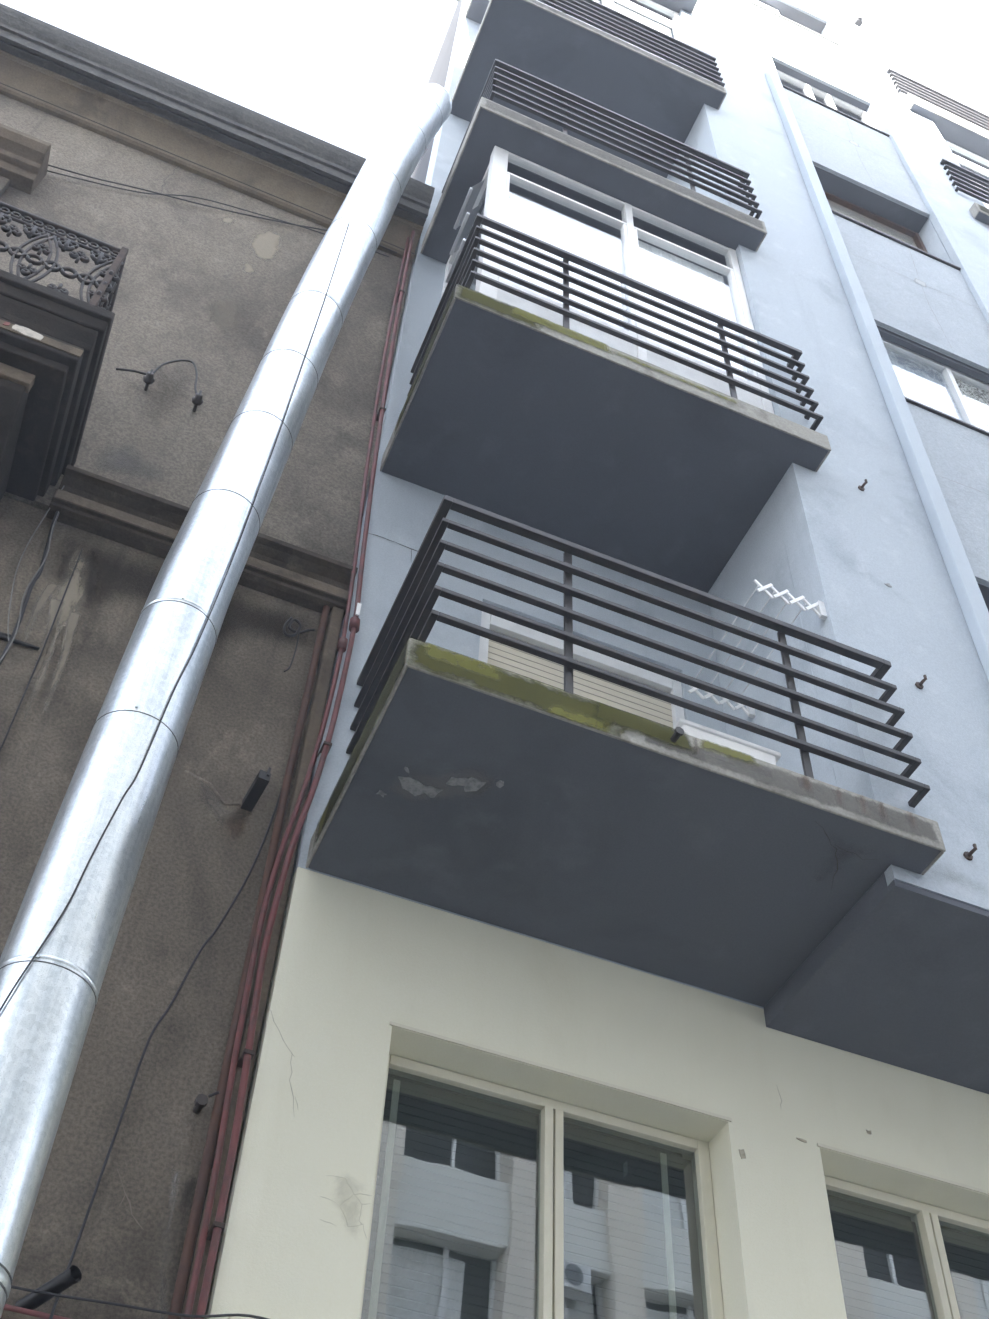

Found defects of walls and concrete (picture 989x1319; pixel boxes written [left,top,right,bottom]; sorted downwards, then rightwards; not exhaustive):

damp [25,549,157,709]
damp [218,601,299,639]
peeling [376,767,504,800]
crack [271,1012,298,1111]